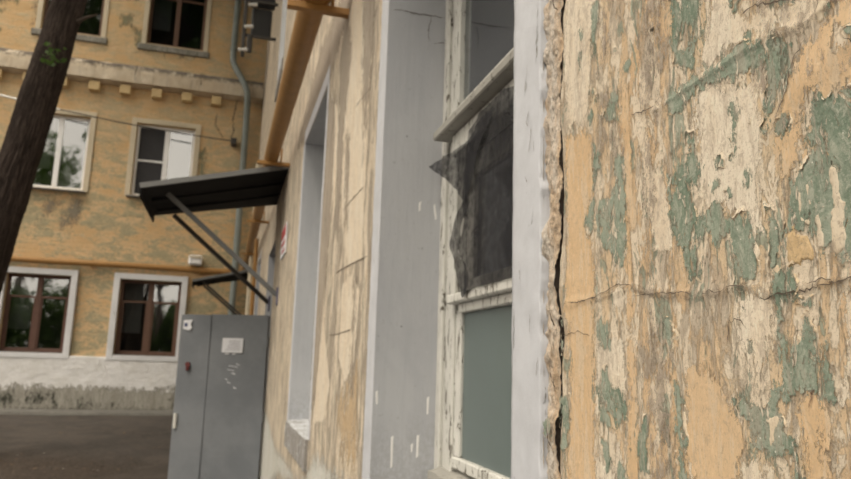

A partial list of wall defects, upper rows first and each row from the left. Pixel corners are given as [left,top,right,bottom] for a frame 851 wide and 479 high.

crack [553,0,566,29]
peeling [313,288,330,425]
peeling [329,0,372,382]
flaking render [541,0,621,479]
peeling [583,143,628,268]
peeling [594,287,635,430]
crack [536,130,851,473]
peeling [636,0,851,479]
peeling [594,438,628,479]